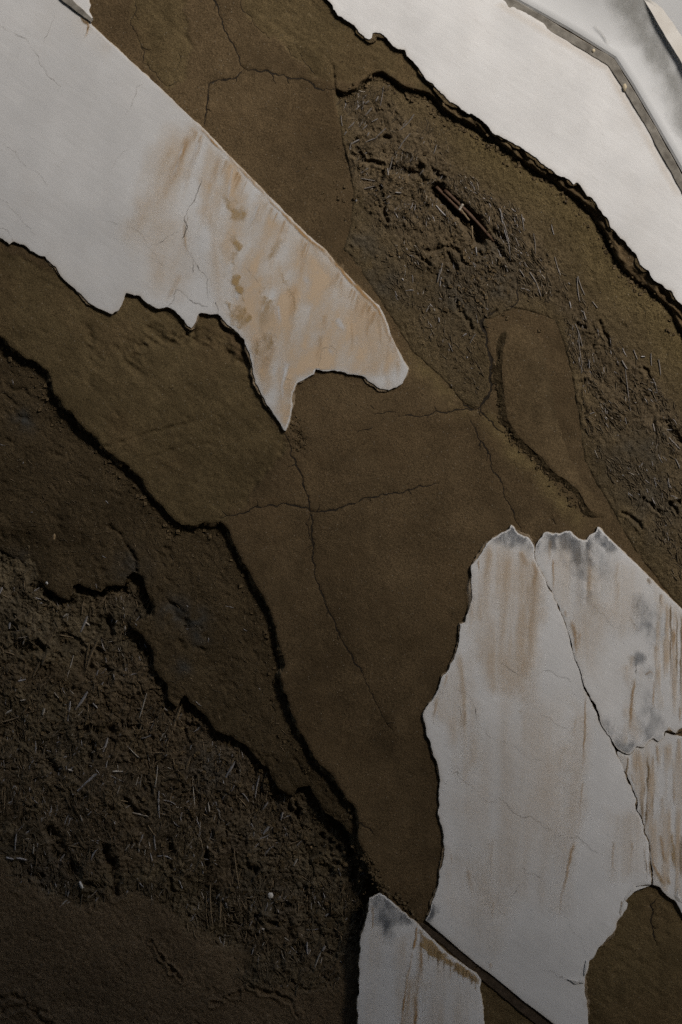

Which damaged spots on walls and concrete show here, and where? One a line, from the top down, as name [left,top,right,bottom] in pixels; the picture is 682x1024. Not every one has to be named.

flaking render [0,0,409,451]
spalling [0,339,485,1024]
crack [223,434,440,733]
crack [358,278,525,531]
spalling [328,0,682,1024]
mould [499,527,616,566]
crack [545,668,643,823]
water stain [419,932,479,982]